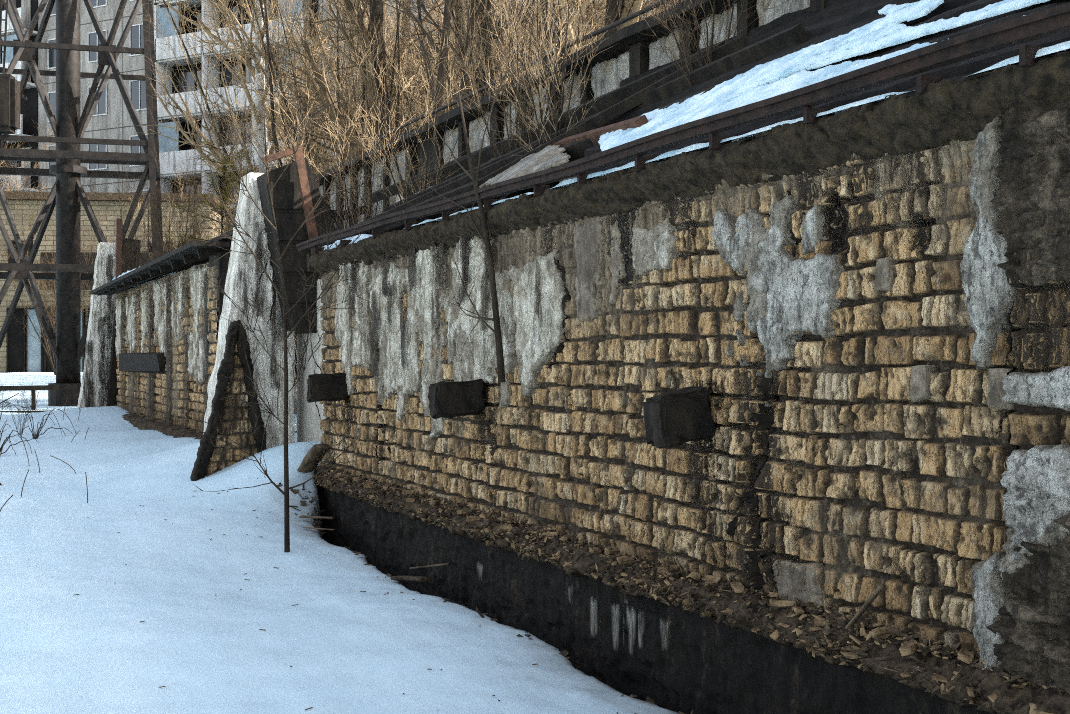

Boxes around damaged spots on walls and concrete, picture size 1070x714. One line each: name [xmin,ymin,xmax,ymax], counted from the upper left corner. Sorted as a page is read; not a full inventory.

flaking render [115,264,209,385]
water stain [344,254,406,379]
water stain [459,237,469,303]
water stain [475,378,500,504]
flaking render [334,216,682,437]
water stain [535,223,555,340]
flaking render [712,187,853,378]
water stain [795,171,820,224]
water stain [851,148,930,234]
spalling [908,212,936,251]
peeling [910,365,936,402]
peeling [773,560,827,611]